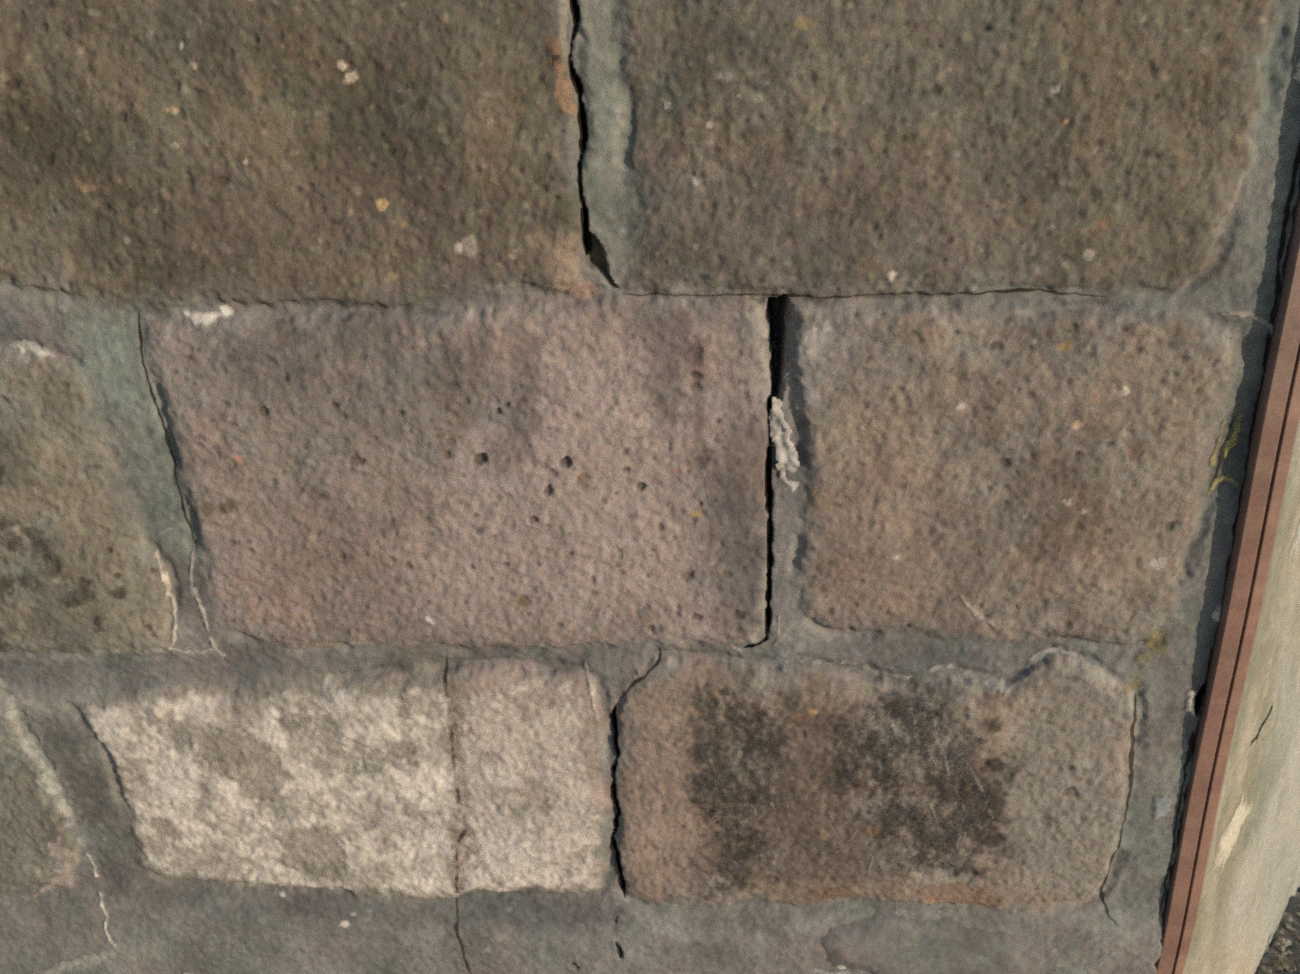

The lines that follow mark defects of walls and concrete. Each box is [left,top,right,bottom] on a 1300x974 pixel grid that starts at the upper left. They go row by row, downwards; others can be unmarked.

crack [568,0,590,256]
crack [138,309,198,553]
crack [744,397,772,648]
crack [443,658,471,974]
crack [611,648,662,958]
damp [691,699,726,820]
damp [949,759,1010,876]